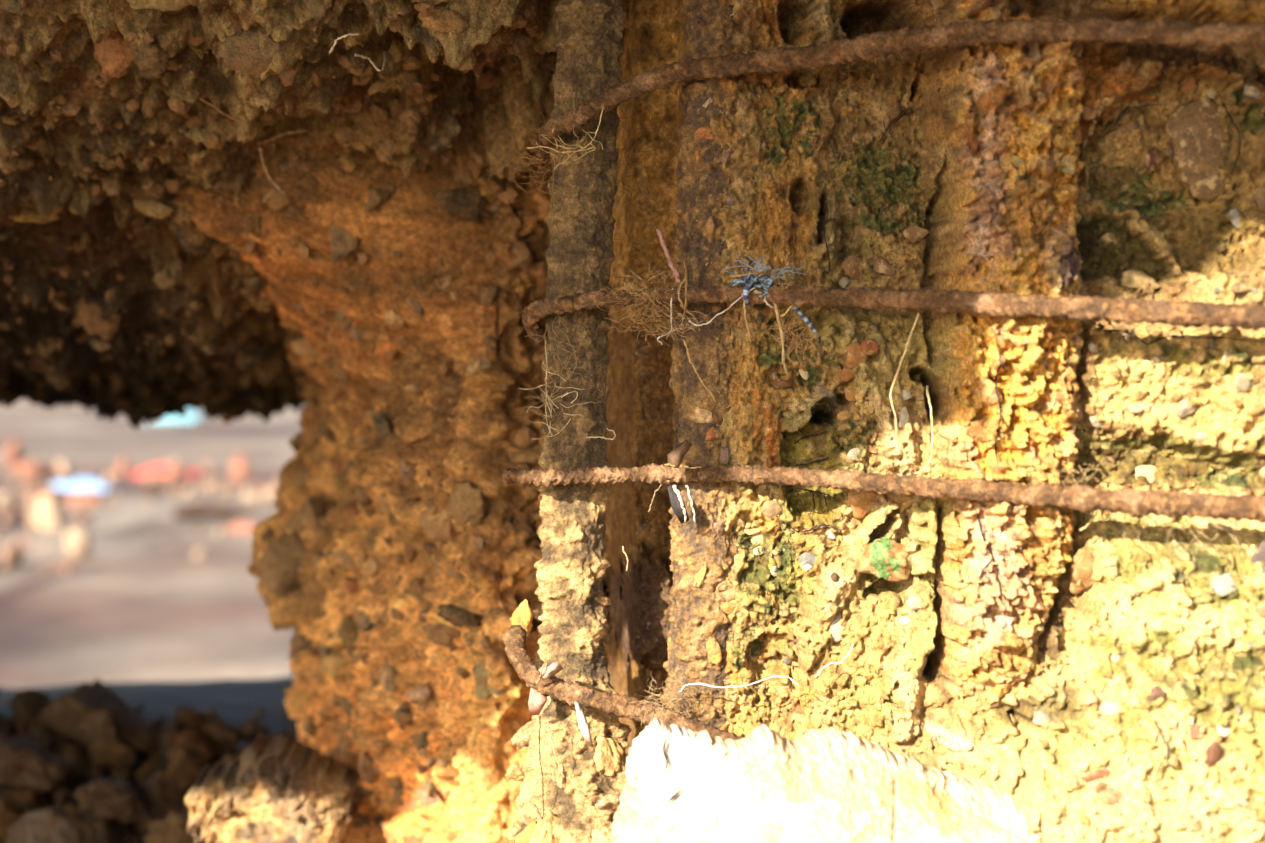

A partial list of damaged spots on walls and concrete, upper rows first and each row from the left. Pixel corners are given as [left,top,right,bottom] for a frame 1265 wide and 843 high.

rust [743,169,819,276]
rust [1065,41,1155,186]
spalling [1080,61,1265,282]
rust [726,304,786,468]
peeling [778,386,849,471]
spalling [912,371,948,423]
spalling [1076,320,1265,459]
rust [722,639,758,695]
peeling [779,485,848,547]
rust [934,498,965,627]
crack [975,509,1014,626]
spalling [1025,528,1107,701]